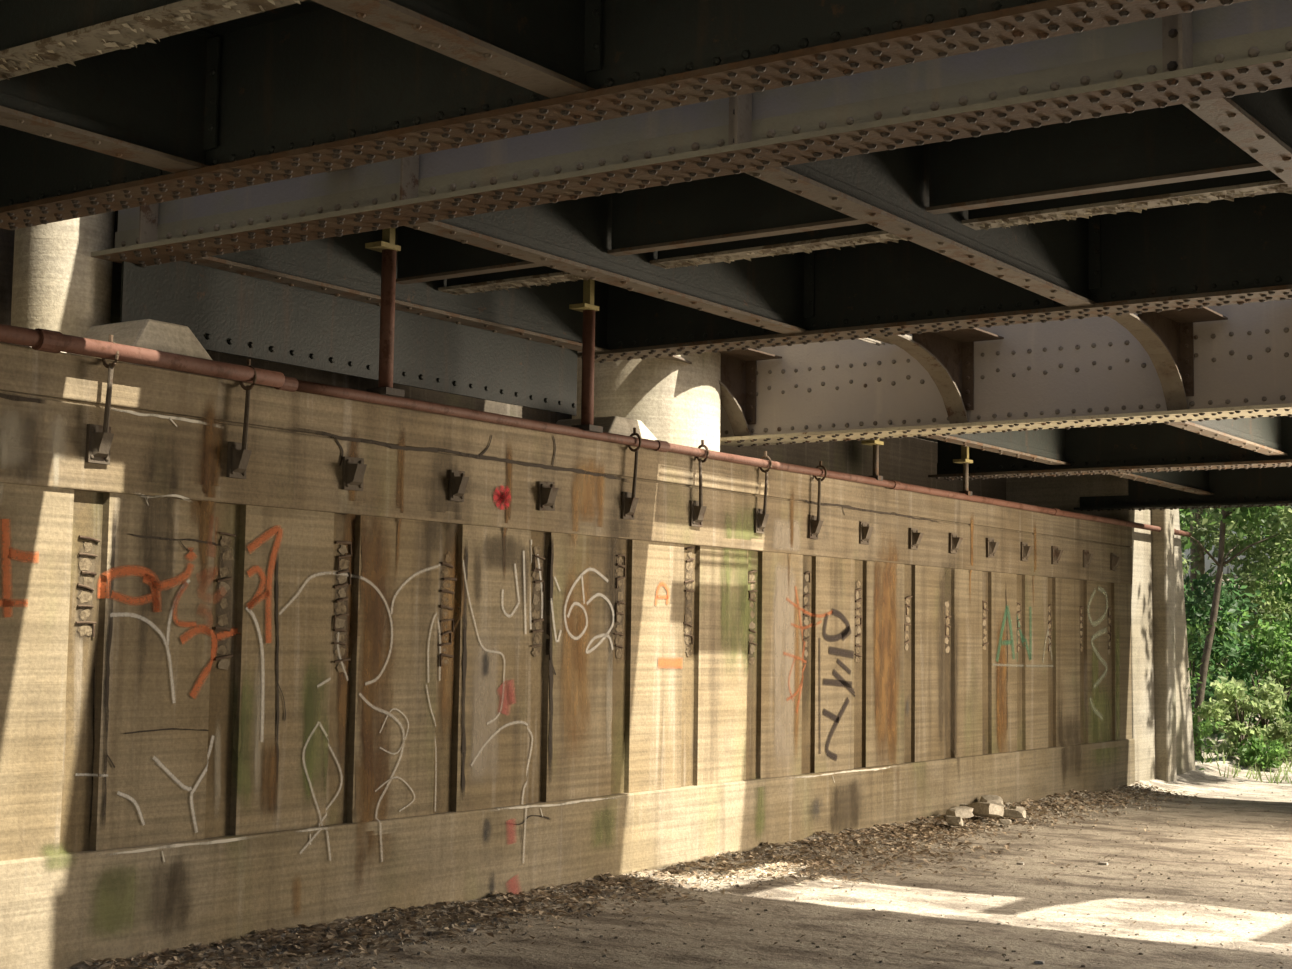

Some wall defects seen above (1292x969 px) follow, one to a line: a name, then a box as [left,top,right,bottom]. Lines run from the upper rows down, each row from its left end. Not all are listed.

rust [192,408,222,580]
spalling [214,532,237,670]
spalling [333,541,352,672]
rust [338,436,405,865]
spalling [439,552,457,667]
rust [564,573,589,742]